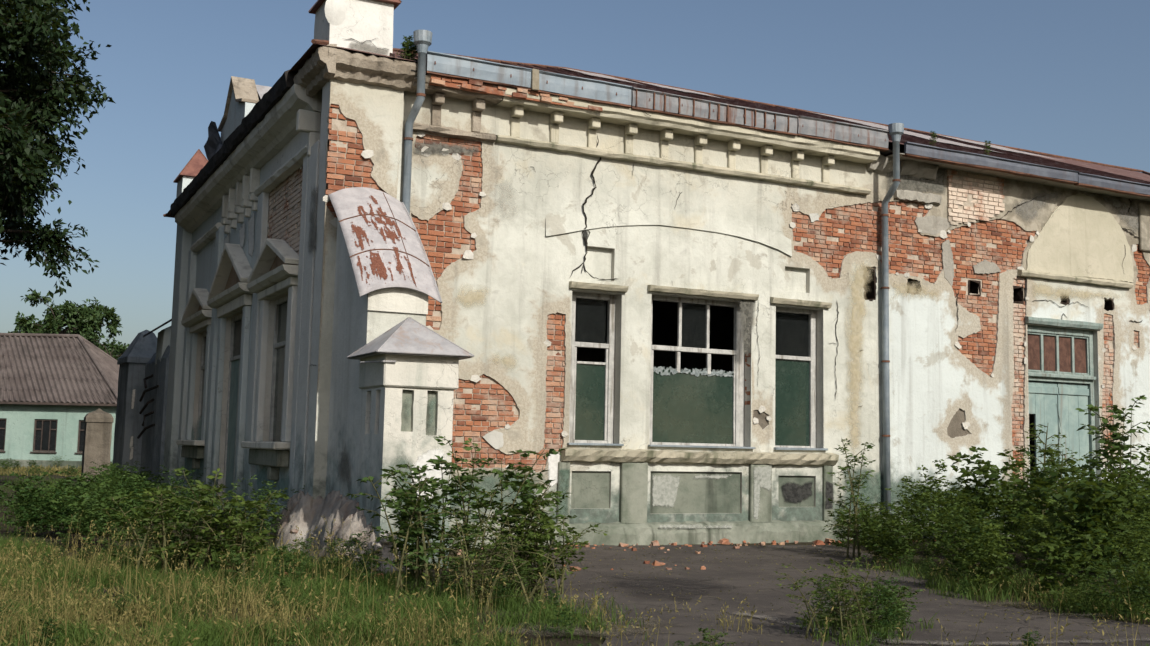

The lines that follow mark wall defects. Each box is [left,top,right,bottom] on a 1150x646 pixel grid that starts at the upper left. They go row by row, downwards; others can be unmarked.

flaking render [268,166,303,255]
flaking render [323,102,384,228]
corrosion [351,195,416,285]
flaking render [411,131,486,330]
crack [570,136,616,280]
crack [1121,199,1139,271]
flaking render [789,169,1039,479]
flaking render [412,313,568,499]